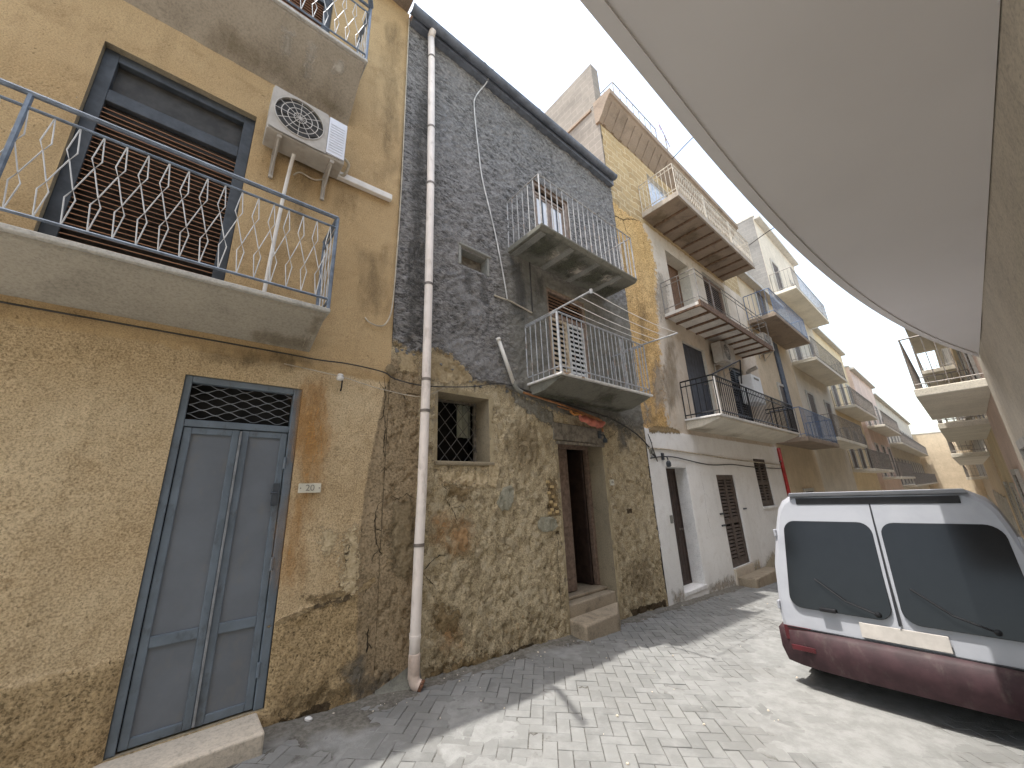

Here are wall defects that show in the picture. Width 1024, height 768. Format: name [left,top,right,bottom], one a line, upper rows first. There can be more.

peeling [395,340,554,425]
peeling [644,365,680,434]
spalling [438,462,500,502]
spalling [546,479,561,516]
spalling [431,599,462,643]
spalling [630,590,667,616]
spalling [425,616,540,679]